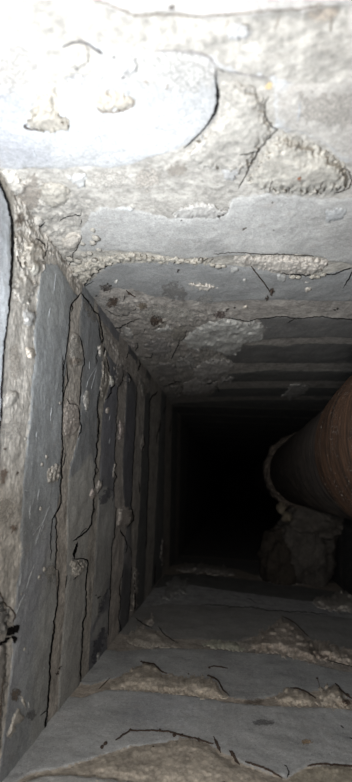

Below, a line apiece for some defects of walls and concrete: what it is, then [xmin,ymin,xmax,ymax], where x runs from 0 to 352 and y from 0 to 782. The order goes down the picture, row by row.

crack [238,99,278,189]
crack [40,263,187,727]